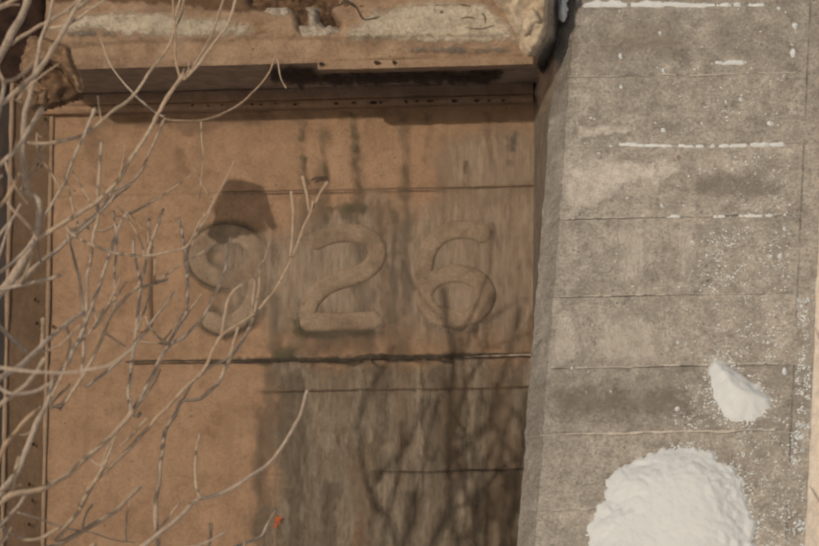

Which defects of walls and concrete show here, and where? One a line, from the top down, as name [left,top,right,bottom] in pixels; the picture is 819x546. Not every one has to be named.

spalling [19,12,256,121]
leakage [270,67,503,89]
peeling [252,0,559,68]
leakage [258,131,534,347]
leakage [235,346,530,546]